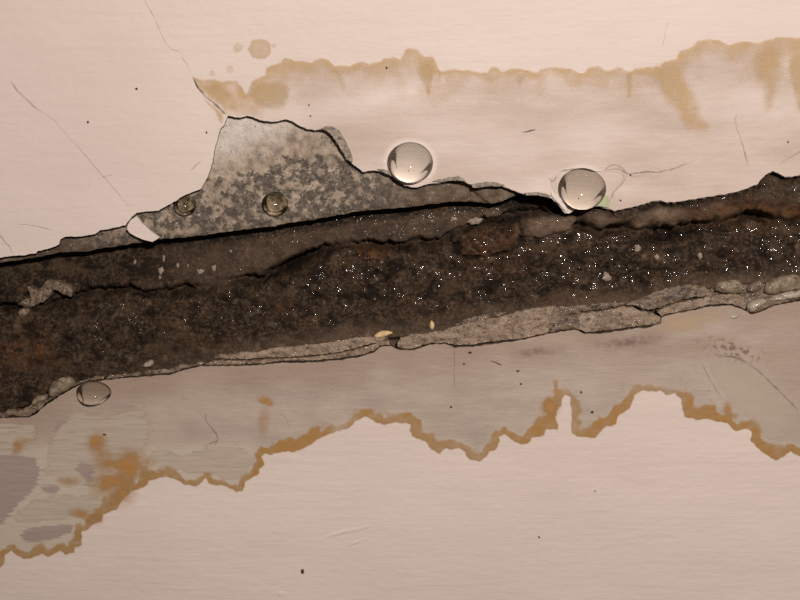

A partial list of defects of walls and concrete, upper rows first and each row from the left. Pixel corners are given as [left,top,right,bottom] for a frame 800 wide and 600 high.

damp [193,40,542,101]
damp [632,40,751,127]
spalling [0,116,800,564]
rust [347,383,562,461]
rust [572,389,656,438]
rust [676,392,800,460]
rust [0,426,332,567]